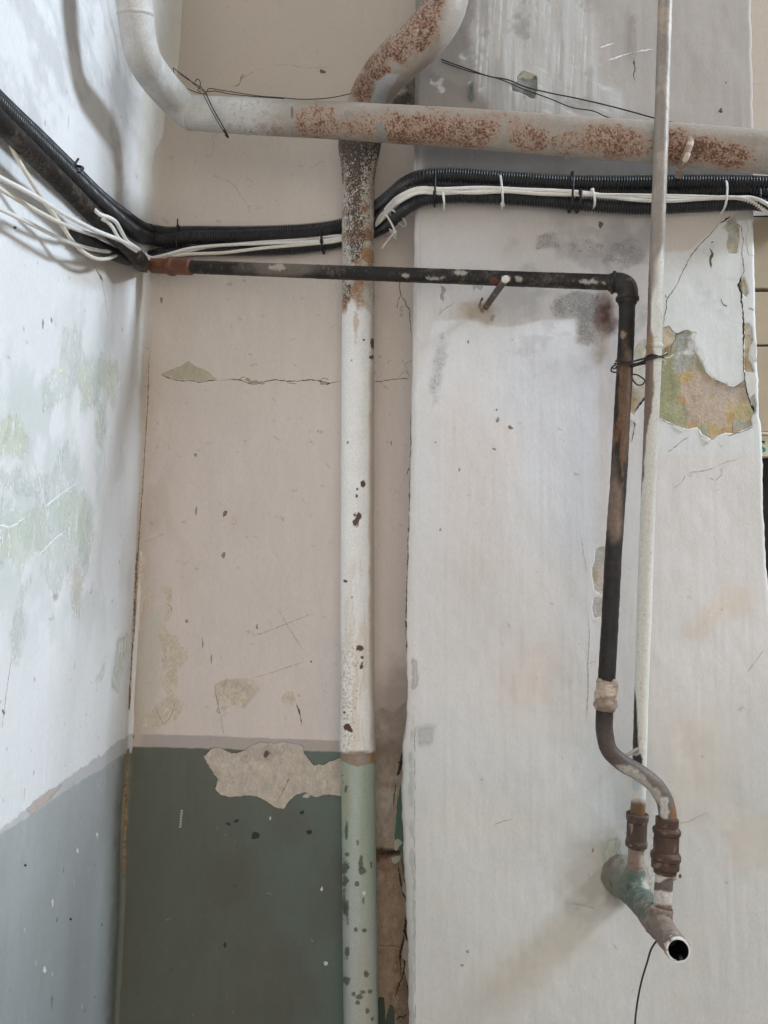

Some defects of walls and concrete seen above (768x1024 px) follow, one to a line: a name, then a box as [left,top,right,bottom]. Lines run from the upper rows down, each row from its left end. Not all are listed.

crack [228,376,338,385]
peeling [630,339,646,440]
spalling [659,326,754,444]
crack [663,215,757,427]
peeling [100,550,188,728]
spalling [203,679,341,820]
spalling [375,703,416,1024]